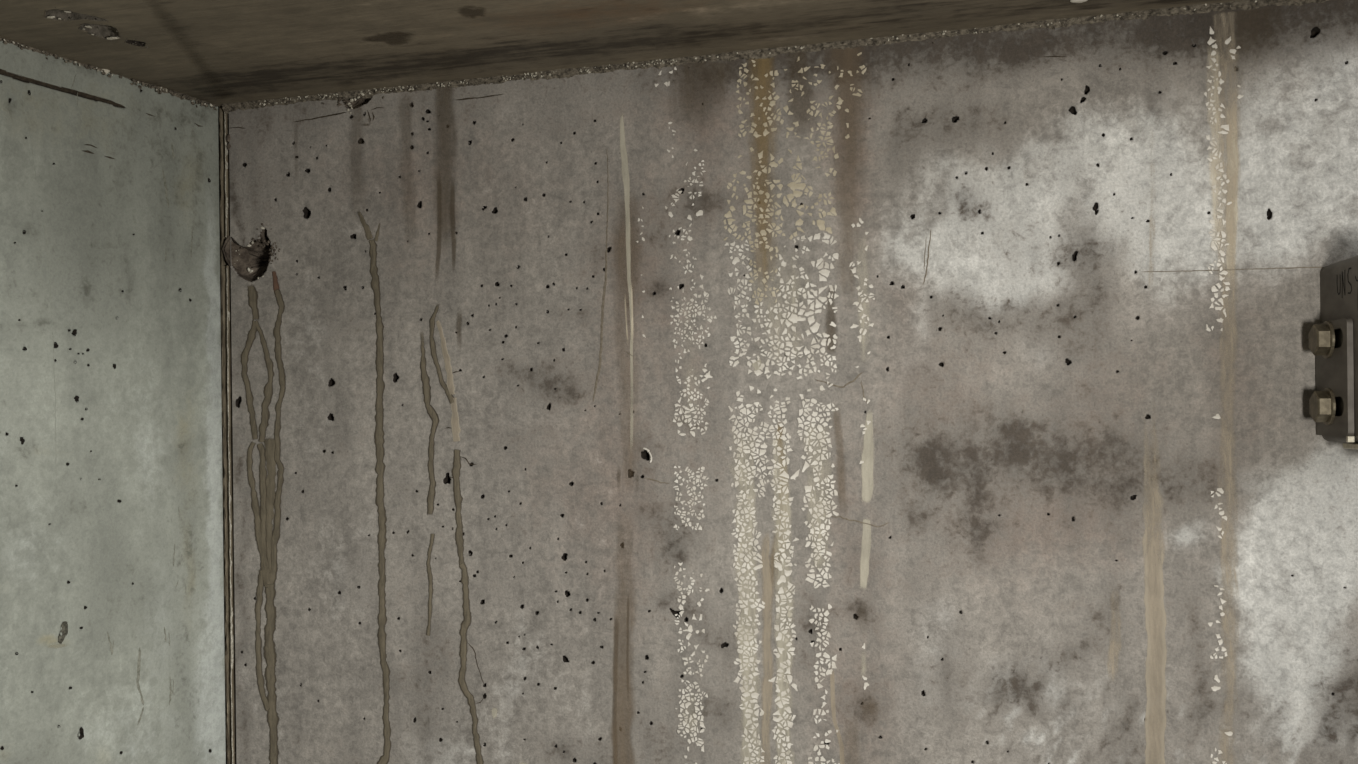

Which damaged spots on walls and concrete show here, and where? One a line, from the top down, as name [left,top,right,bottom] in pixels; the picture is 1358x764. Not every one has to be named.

spalling [222,223,280,283]
water stain [665,122,717,437]
water stain [673,466,709,530]
water stain [674,562,709,764]
water stain [723,48,875,764]
water stain [1143,478,1167,764]
water stain [1208,414,1236,709]
water stain [1204,16,1244,389]